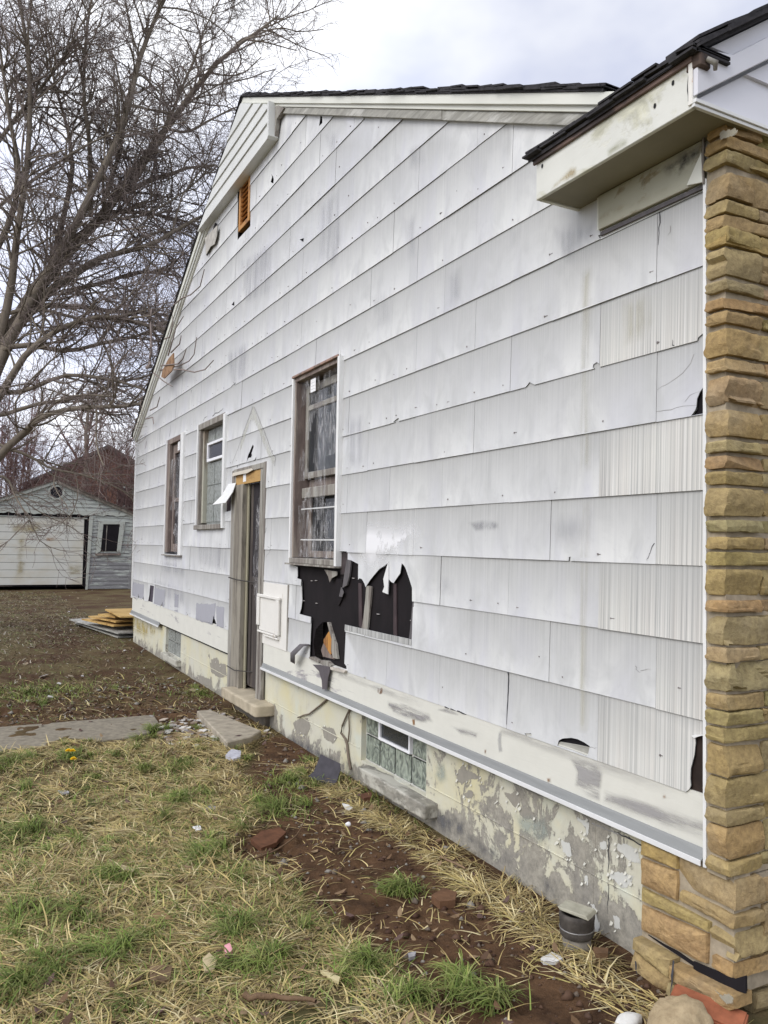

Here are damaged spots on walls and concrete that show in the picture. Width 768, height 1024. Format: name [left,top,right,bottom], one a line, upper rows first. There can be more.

crack [656,340,700,412]
peeling [293,718,337,744]
peeling [455,762,482,802]
peeling [494,786,535,820]
peeling [559,738,600,787]
spalling [690,735,703,793]
peeling [554,817,589,861]
peeling [594,835,641,888]
peeling [588,902,620,932]